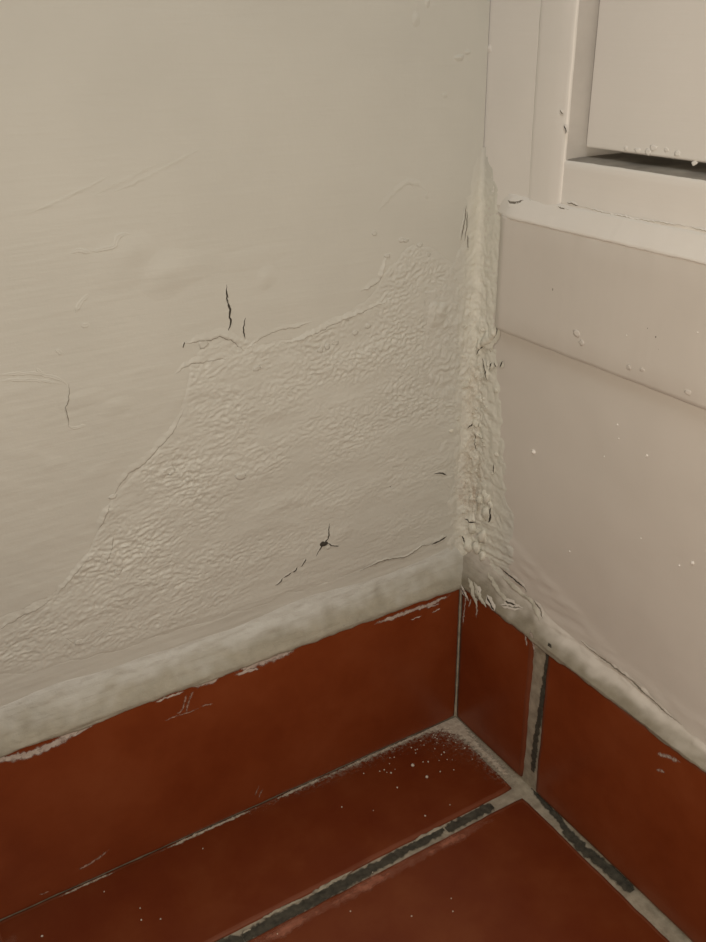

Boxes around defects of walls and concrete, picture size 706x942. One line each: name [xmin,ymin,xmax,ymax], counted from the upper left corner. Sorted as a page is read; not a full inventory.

crack [223,285,246,339]
crack [275,523,340,586]
water stain [531,643,551,772]
water stain [531,788,634,893]